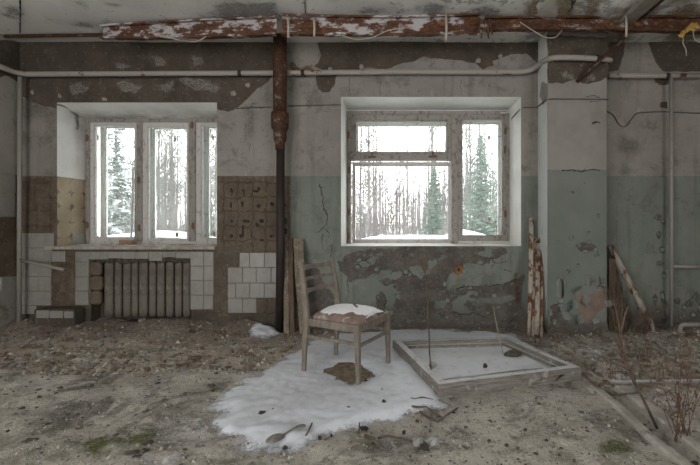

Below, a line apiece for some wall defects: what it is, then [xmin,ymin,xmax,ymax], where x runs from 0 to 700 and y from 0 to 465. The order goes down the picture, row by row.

flaking render [0,40,273,112]
flaking render [315,42,538,93]
flaking render [540,35,625,105]
crack [316,184,332,258]
spalling [191,219,275,327]
peeling [337,246,525,327]
peeling [548,275,700,329]